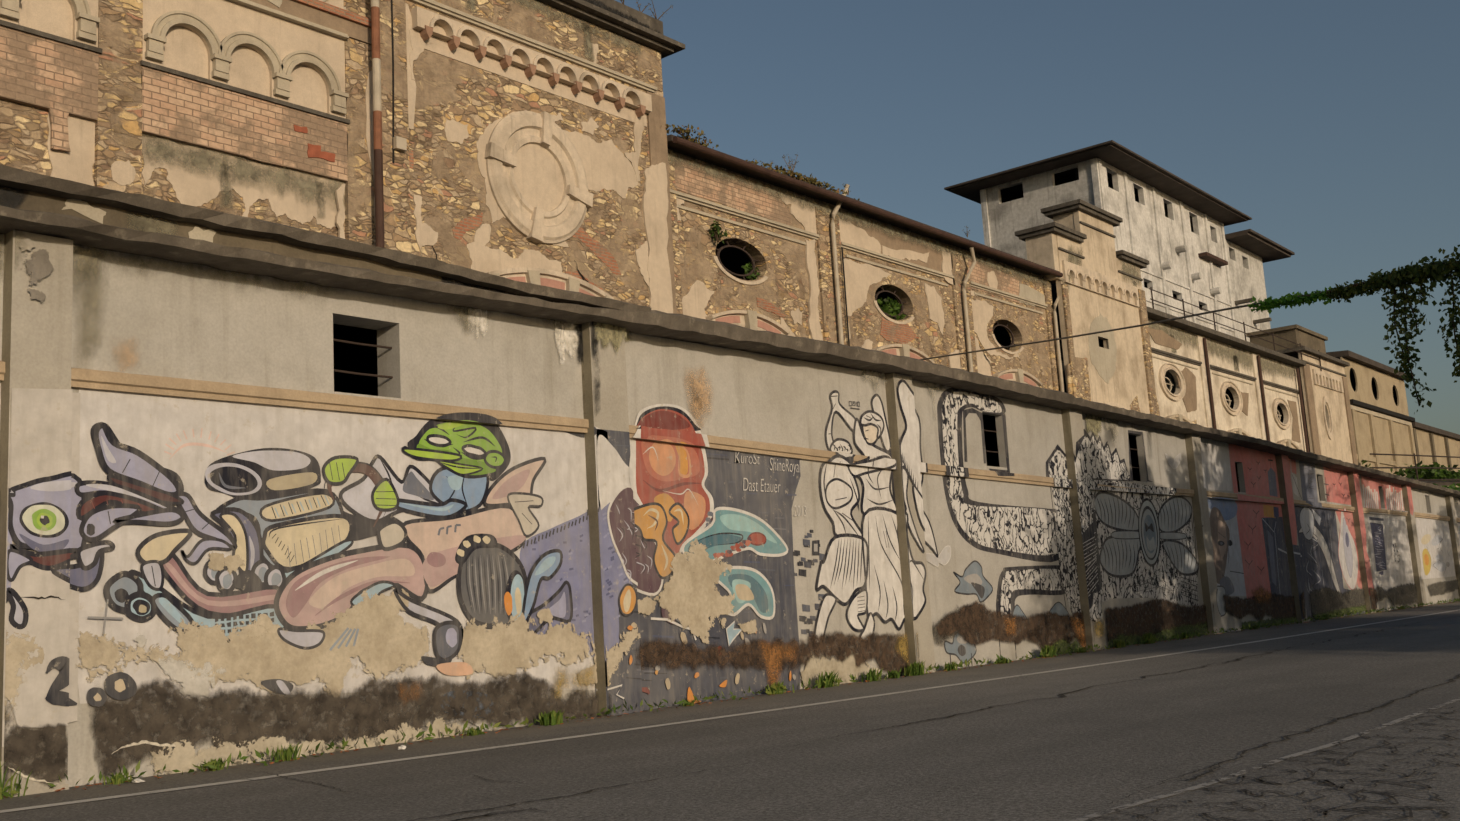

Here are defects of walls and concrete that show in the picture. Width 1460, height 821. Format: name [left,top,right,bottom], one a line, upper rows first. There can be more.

flaking render [968,258,1020,303]
peeling [4,631,44,721]
peeling [208,552,245,575]
peeling [76,589,432,701]
peeling [457,538,758,686]
water stain [638,579,1459,676]
water stain [3,711,68,788]
water stain [92,672,611,779]